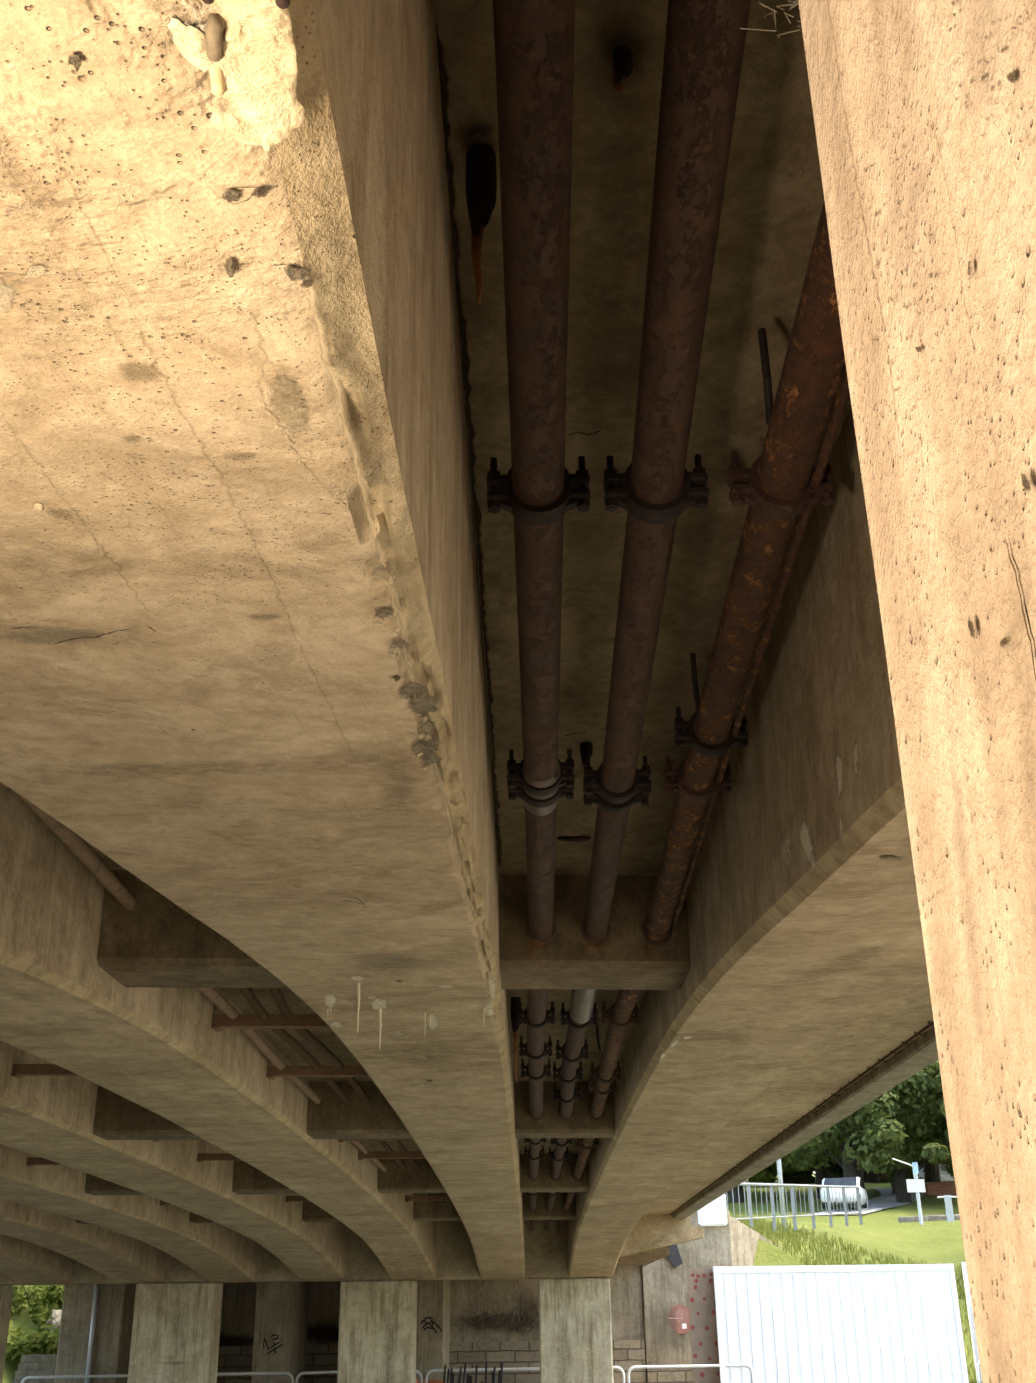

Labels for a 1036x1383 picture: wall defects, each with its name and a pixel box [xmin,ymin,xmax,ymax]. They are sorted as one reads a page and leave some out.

spalling [167,0,303,152]
crack [13,626,156,645]
spalling [272,263,473,912]
crack [1005,538,1036,679]
efflorescence [323,976,404,1049]